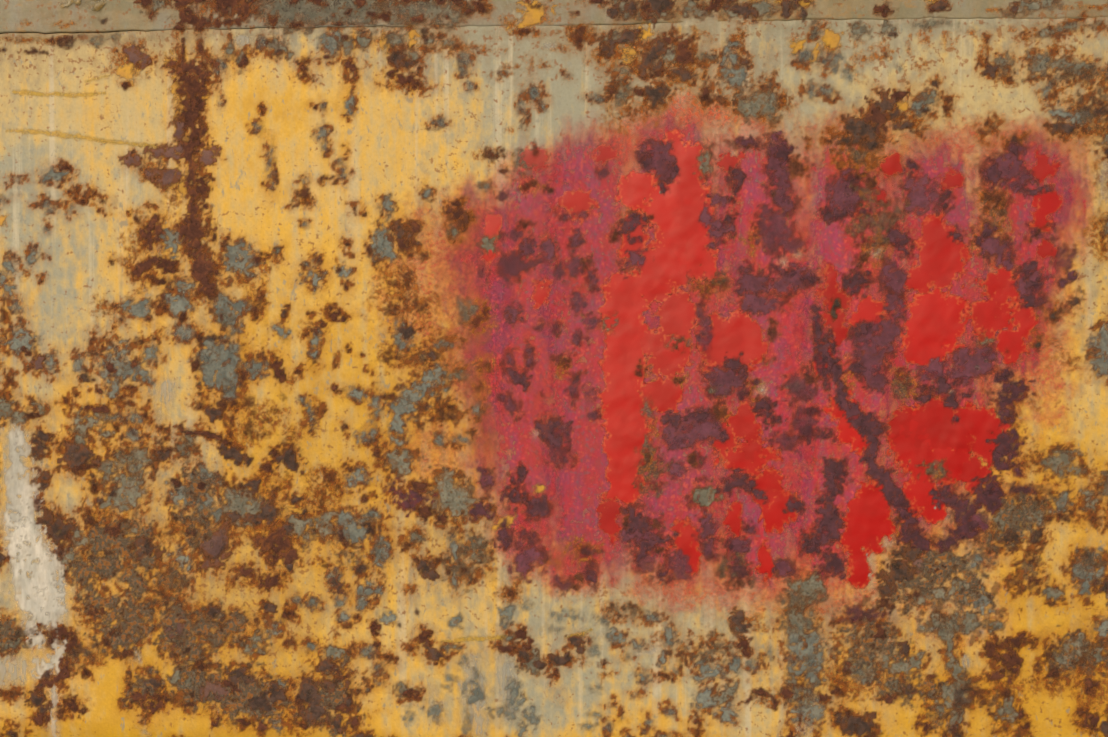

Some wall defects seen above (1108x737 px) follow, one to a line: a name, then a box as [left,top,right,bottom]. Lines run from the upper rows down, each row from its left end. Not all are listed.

corrosion [558,0,810,132]
spalling [0,158,108,230]
corrosion [2,0,492,303]
spalling [477,211,618,346]
damp [0,423,67,684]
corrosion [0,392,374,737]
spalling [0,194,490,696]
corrosion [377,448,498,595]
spalling [441,466,603,629]
spalling [584,131,1108,737]
corrosion [379,624,592,686]
corrosion [912,612,1047,737]